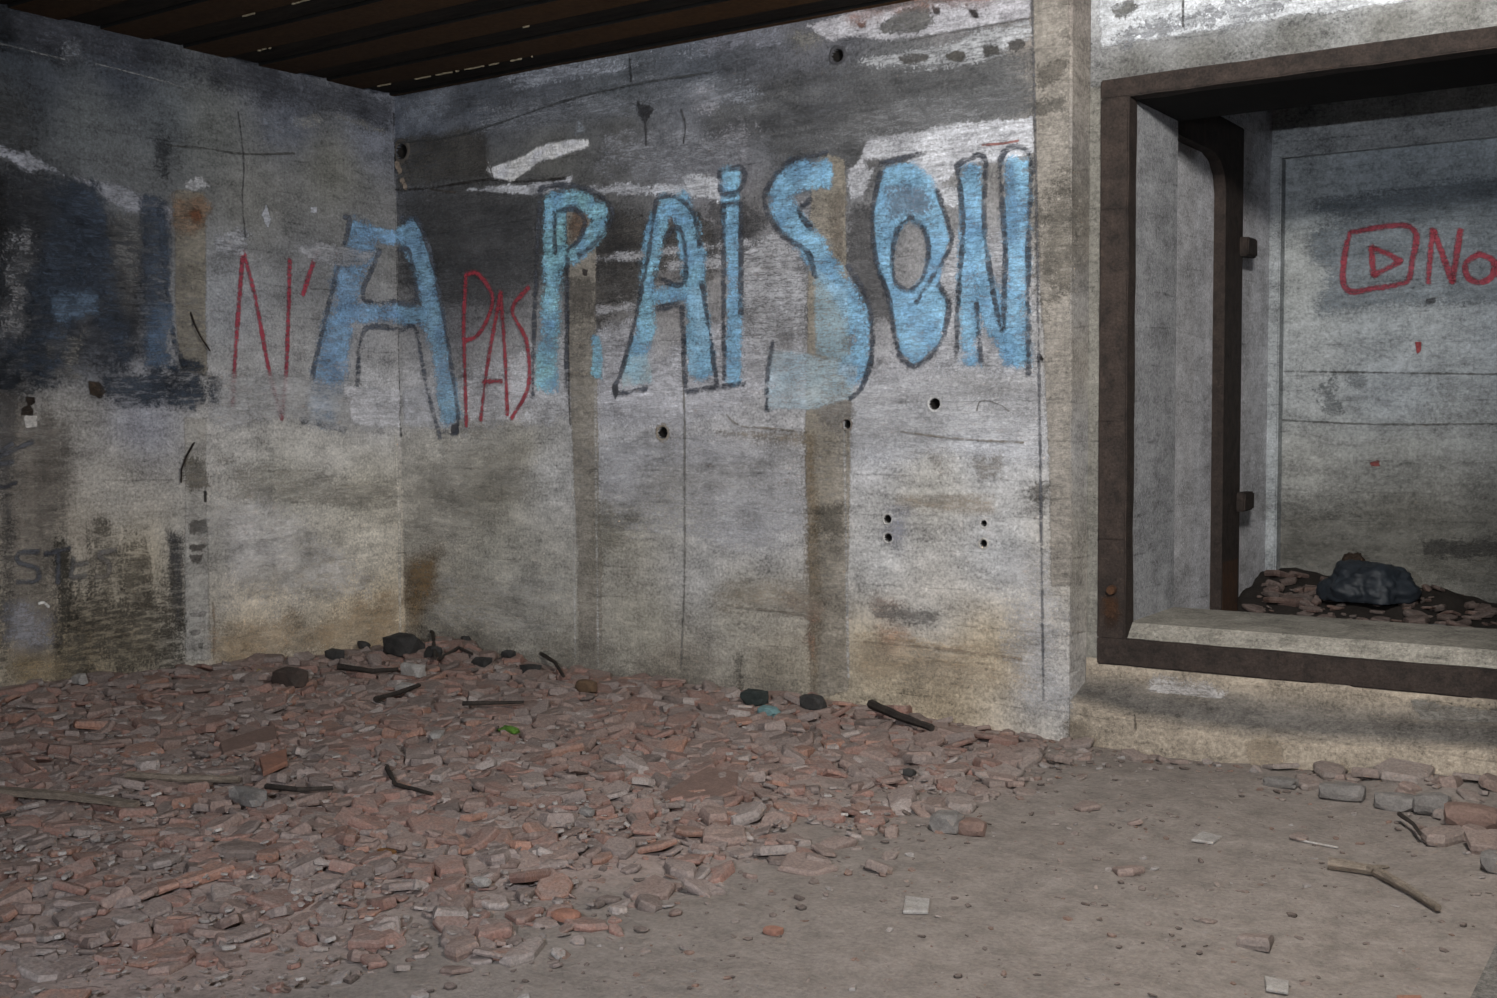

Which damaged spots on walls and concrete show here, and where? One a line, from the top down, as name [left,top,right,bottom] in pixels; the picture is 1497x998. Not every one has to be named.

water stain [0,393,189,682]
water stain [209,591,784,691]